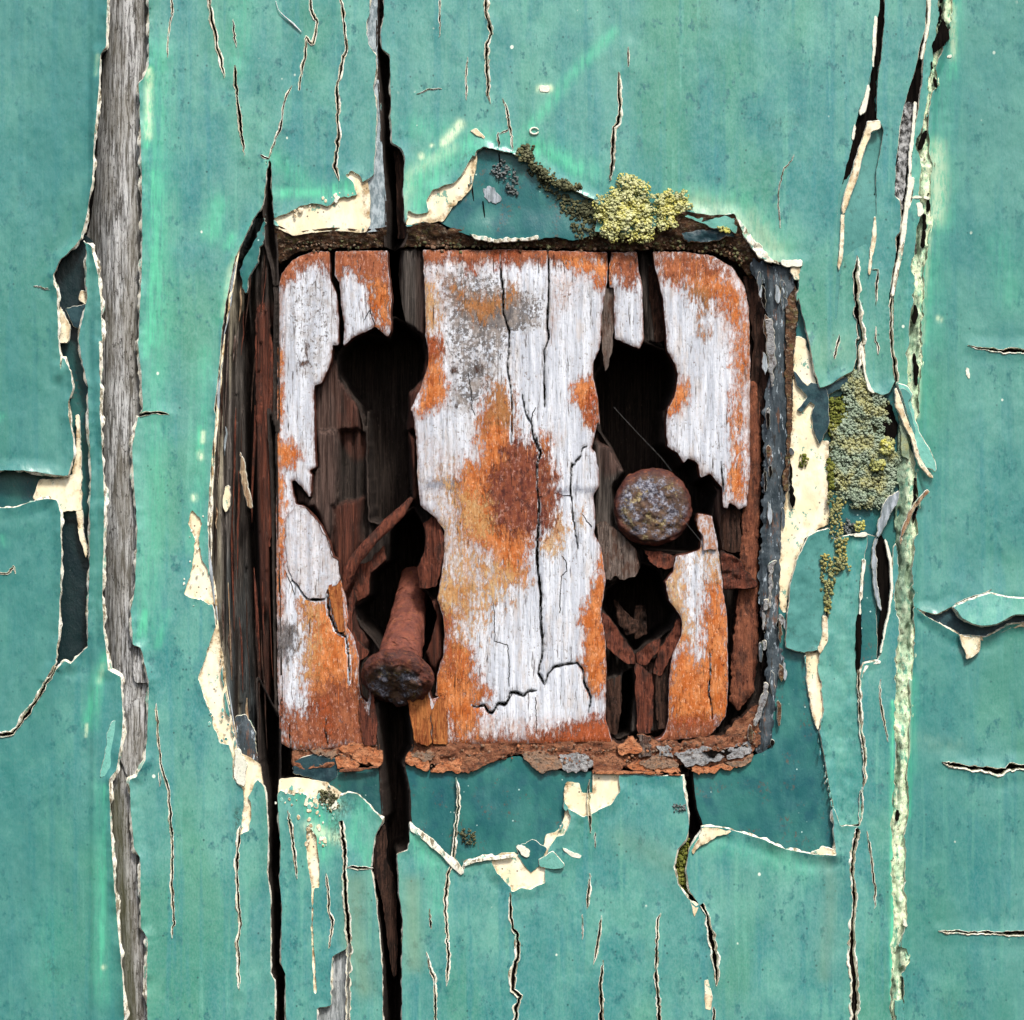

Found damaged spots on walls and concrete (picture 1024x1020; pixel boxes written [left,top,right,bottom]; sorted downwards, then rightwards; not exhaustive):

peeling [0,0,149,1020]
crack [207,0,350,1020]
peeling [274,80,386,236]
rust [278,580,384,782]
rust [279,251,391,332]
crack [376,0,408,251]
peeling [405,756,620,891]
rust [414,249,642,420]
crack [473,250,592,734]
rust [405,373,761,776]
peeling [692,259,936,855]
crack [846,670,888,1020]